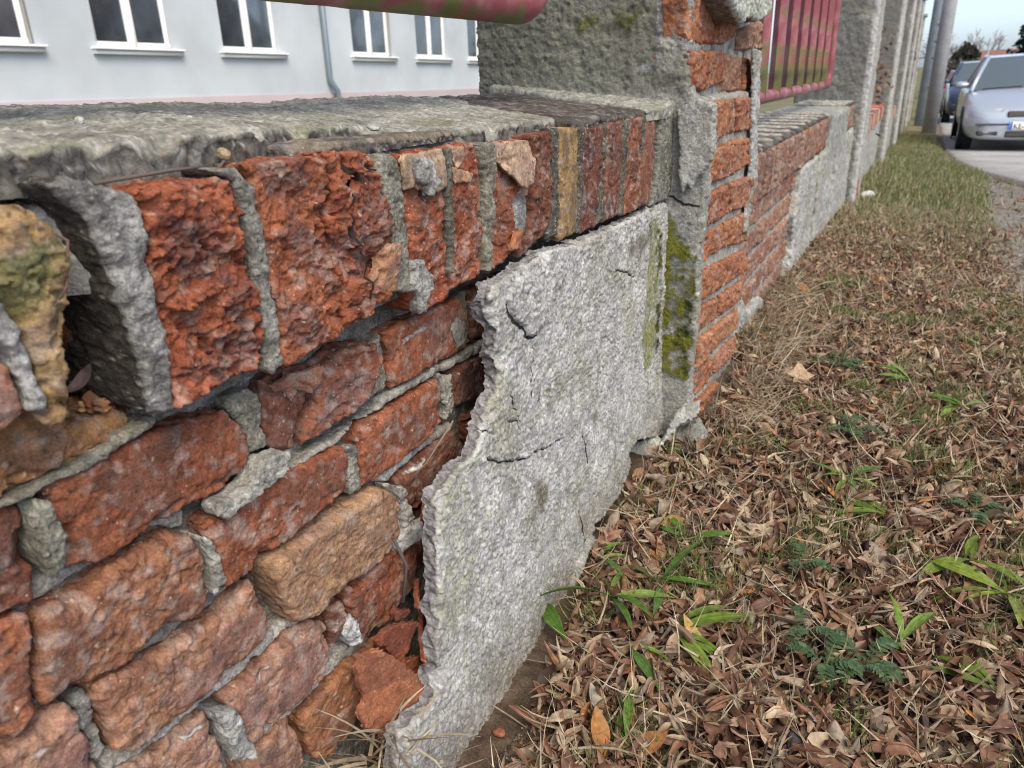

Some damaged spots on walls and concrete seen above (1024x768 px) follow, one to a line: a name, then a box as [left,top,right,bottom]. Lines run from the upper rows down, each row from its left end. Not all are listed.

crack [341,163,377,298]
flaking render [109,0,772,768]
crack [480,303,542,433]
crack [487,435,588,464]